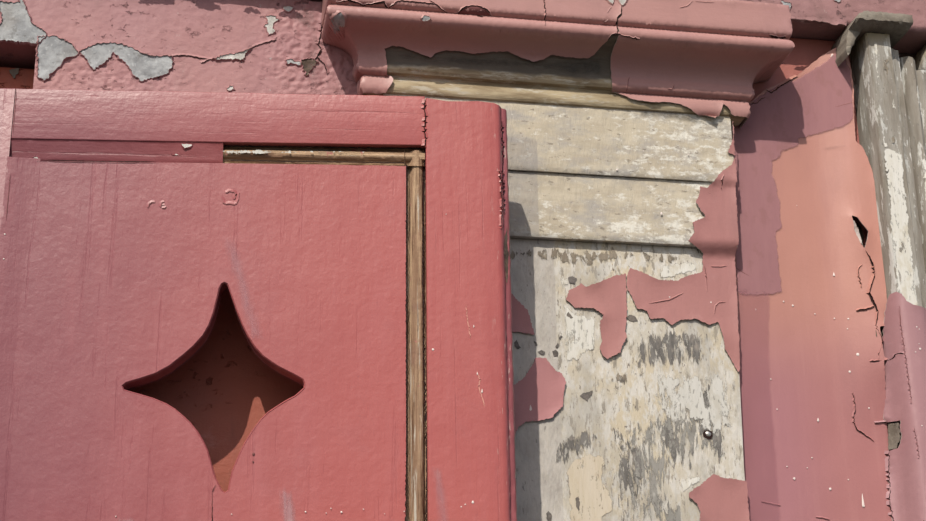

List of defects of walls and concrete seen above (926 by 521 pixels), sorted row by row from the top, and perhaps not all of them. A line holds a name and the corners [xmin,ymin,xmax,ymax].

peeling [0,0,174,83]
peeling [504,121,750,521]
crack [856,251,912,403]
crack [851,392,895,521]